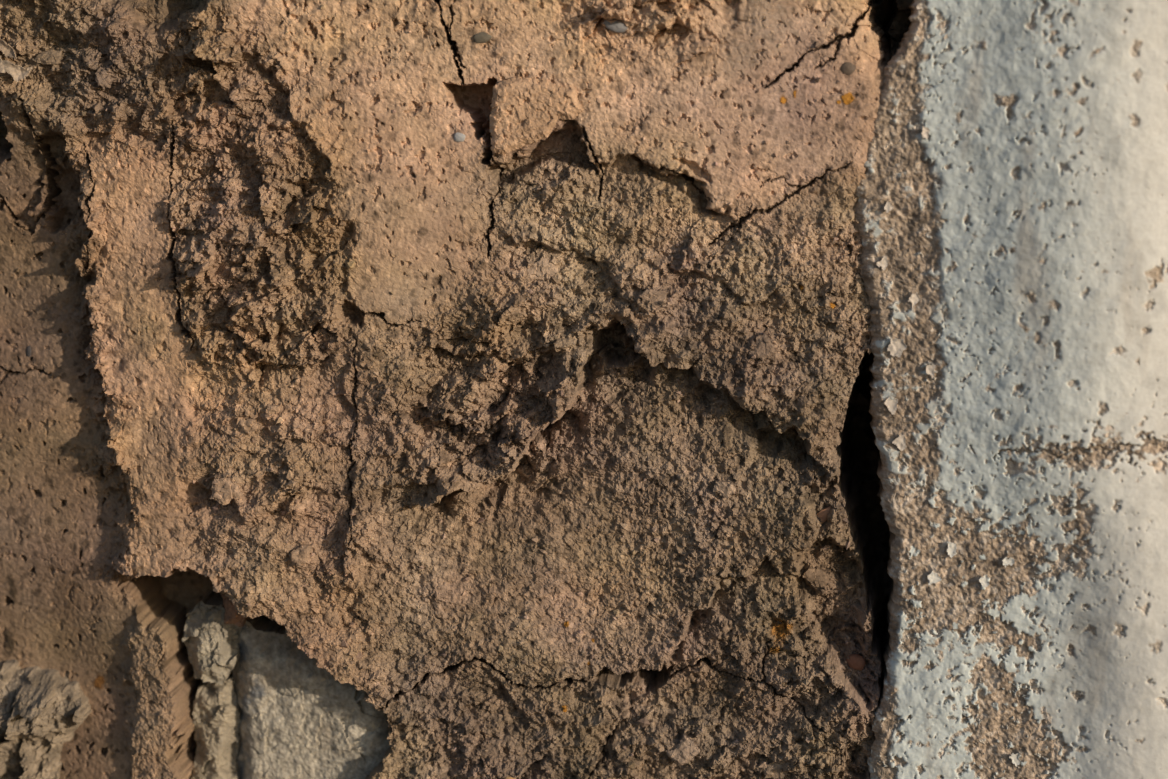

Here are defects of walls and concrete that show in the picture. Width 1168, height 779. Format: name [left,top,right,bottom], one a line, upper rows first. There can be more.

crack [434,0,466,85]
crack [764,5,872,89]
peeling [490,77,583,155]
spalling [994,0,1143,238]
crack [485,157,504,259]
crack [708,163,851,246]
peeling [1129,259,1168,311]
spalling [990,280,1068,391]
spalling [982,352,1032,427]
crack [378,657,605,711]
crack [664,640,827,735]
spalling [934,666,962,696]